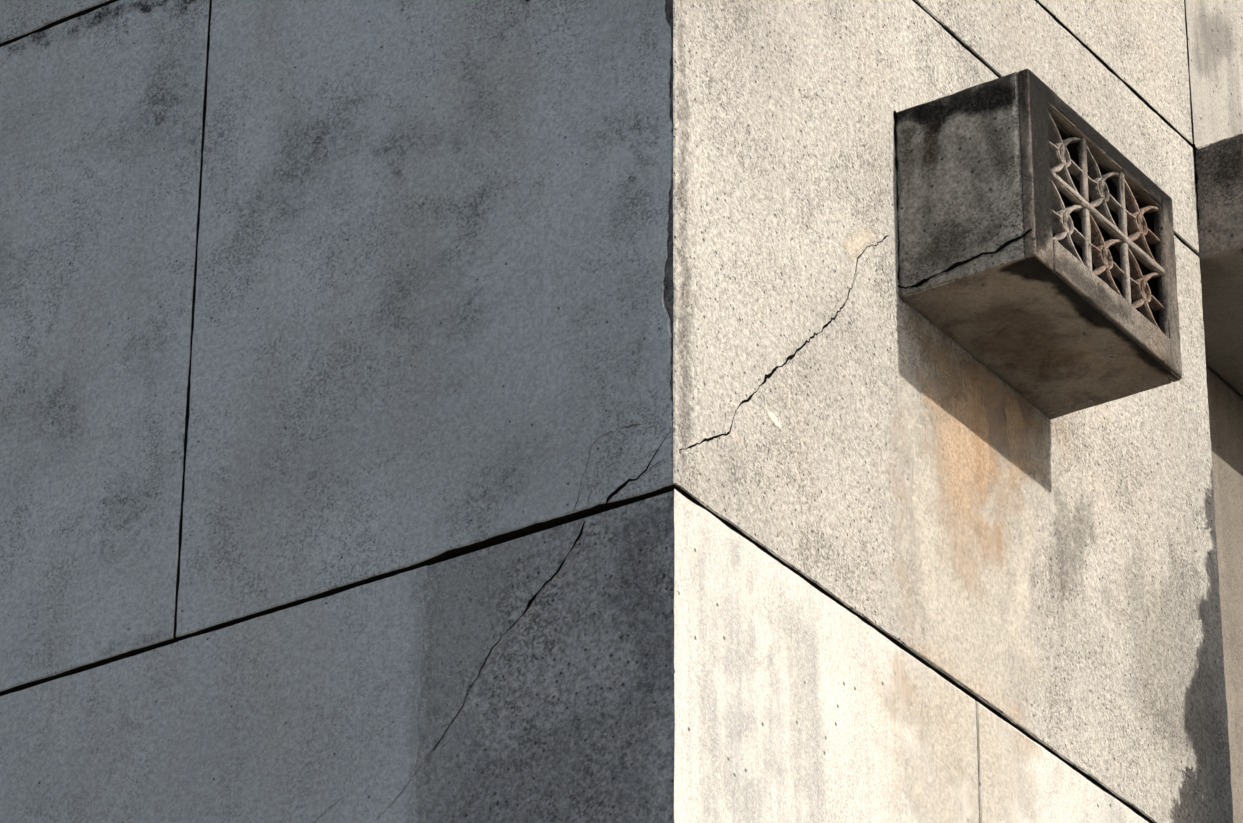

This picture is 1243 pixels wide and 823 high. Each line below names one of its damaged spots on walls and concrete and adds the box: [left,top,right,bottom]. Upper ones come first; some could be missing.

damp [897,69,1179,380]
damp [1196,133,1243,186]
crack [375,110,1032,821]